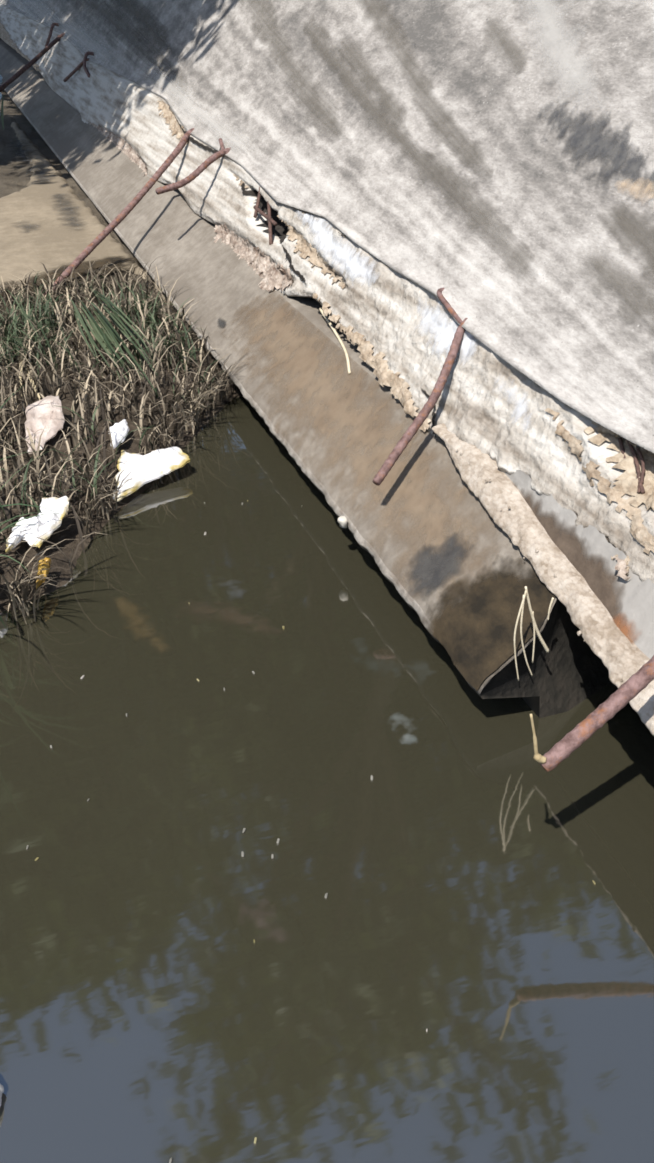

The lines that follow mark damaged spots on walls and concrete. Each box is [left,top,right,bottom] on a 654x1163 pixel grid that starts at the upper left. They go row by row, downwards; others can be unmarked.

spalling [89,122,147,176]
spalling [157,100,189,144]
leakage [539,105,654,192]
spalling [213,223,294,293]
spalling [277,215,345,289]
spalling [312,293,431,432]
spalling [545,408,654,554]
spalling [611,554,631,581]
rust [614,618,631,639]